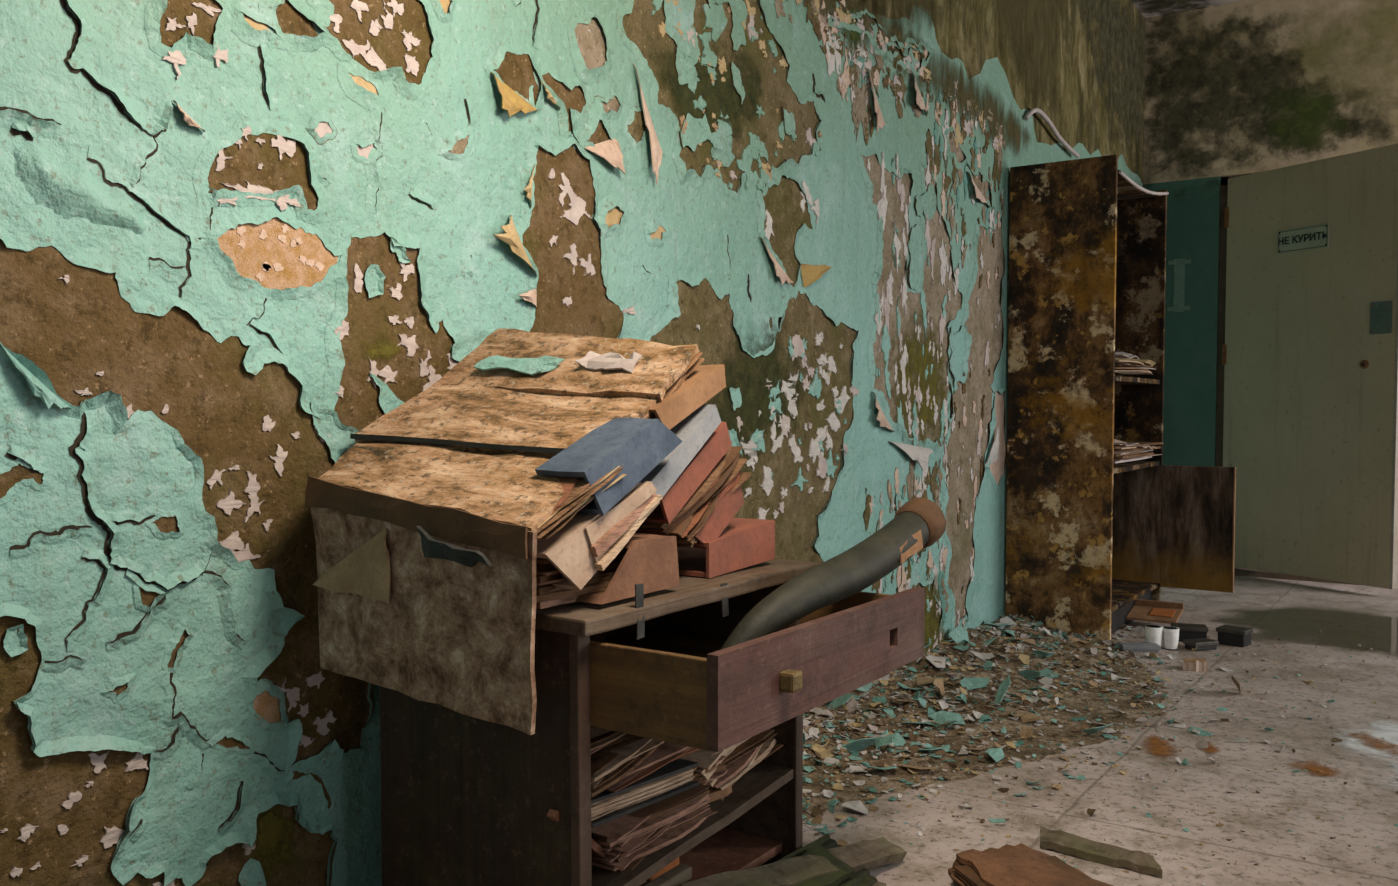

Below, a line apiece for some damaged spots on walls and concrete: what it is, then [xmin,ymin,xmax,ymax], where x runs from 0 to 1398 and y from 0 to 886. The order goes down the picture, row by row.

peeling [144,0,456,113]
damp [807,0,1029,152]
damp [998,0,1060,110]
damp [1077,0,1392,180]
crack [0,0,299,367]
peeling [192,114,383,225]
peeling [484,0,1007,652]
crack [5,409,245,674]
peeling [0,217,472,886]
crack [153,670,210,789]
crack [218,751,285,835]
damp [1342,722,1398,783]